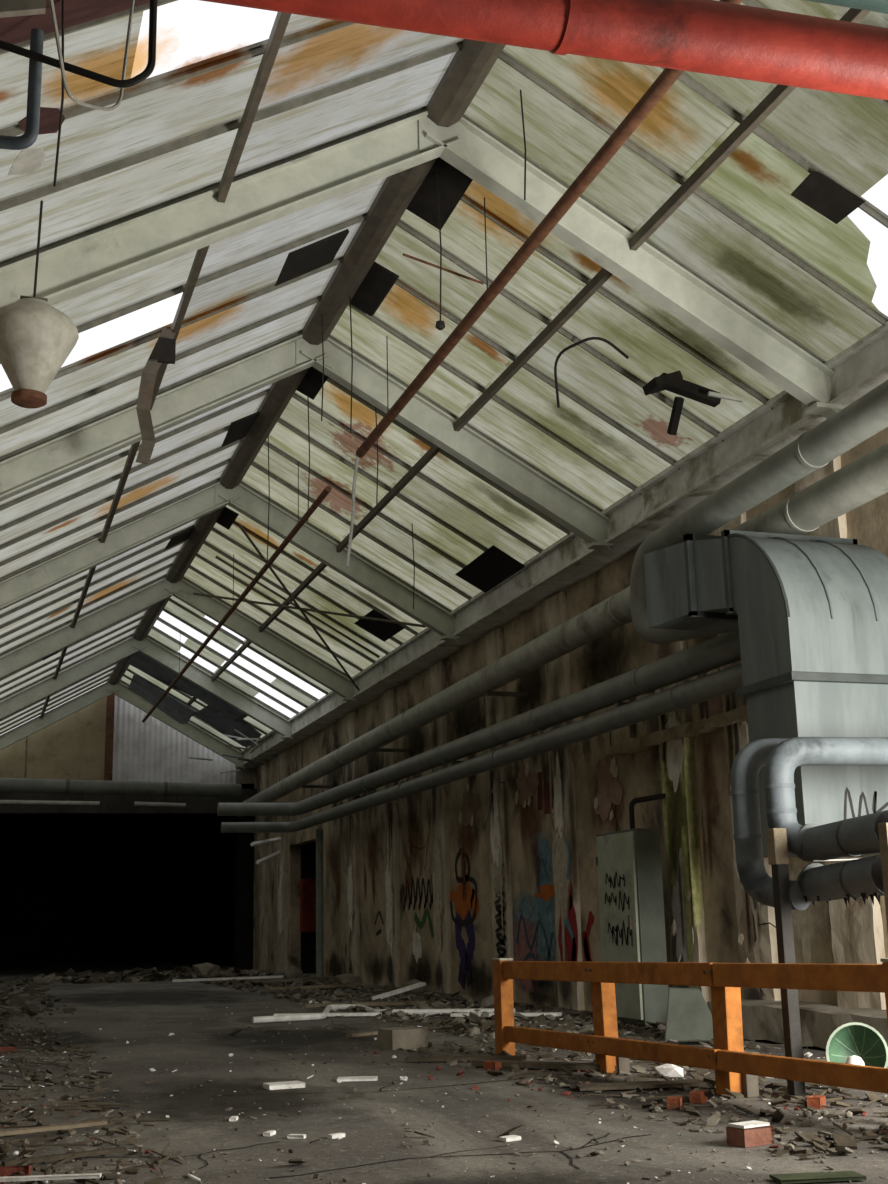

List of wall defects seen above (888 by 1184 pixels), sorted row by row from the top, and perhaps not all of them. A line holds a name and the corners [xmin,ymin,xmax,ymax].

water stain [584,626,624,687]
water stain [516,667,541,715]
water stain [367,751,388,774]
water stain [404,720,436,757]
water stain [454,699,495,737]
water stain [721,694,739,770]
water stain [541,747,577,961]
water stain [661,714,697,962]
water stain [408,960,442,989]
water stain [529,980,571,1010]